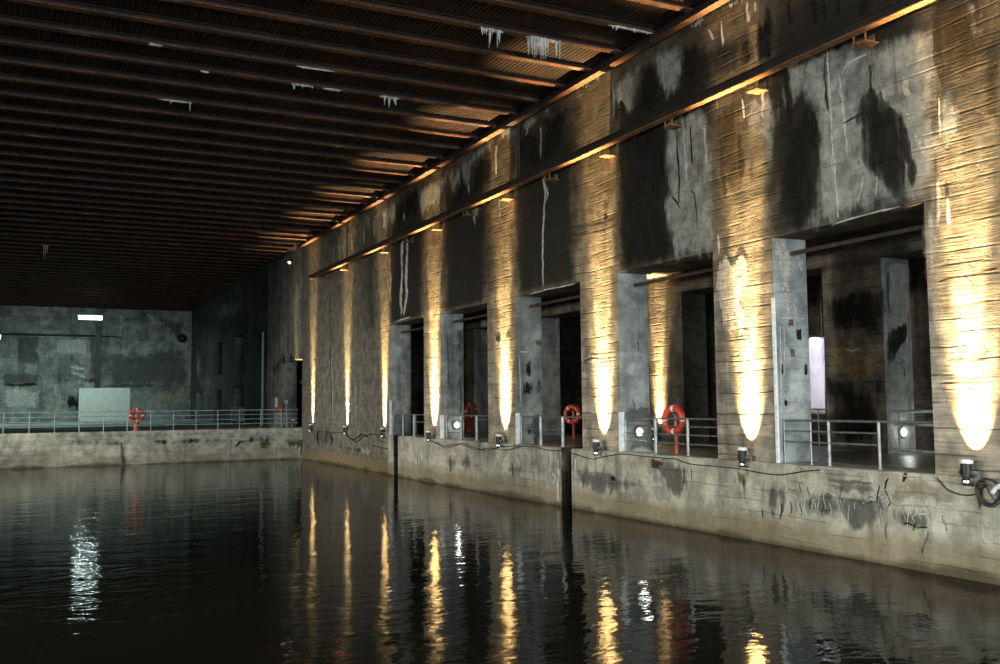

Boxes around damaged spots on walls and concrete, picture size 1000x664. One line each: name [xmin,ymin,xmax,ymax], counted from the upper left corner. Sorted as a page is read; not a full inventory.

water stain [480,27,504,48]
water stain [525,35,561,59]
water stain [389,240,410,322]
water stain [333,110,566,263]
water stain [532,175,574,294]
water stain [620,108,712,265]
water stain [782,34,956,263]
water stain [827,262,911,449]
crack [877,473,928,554]